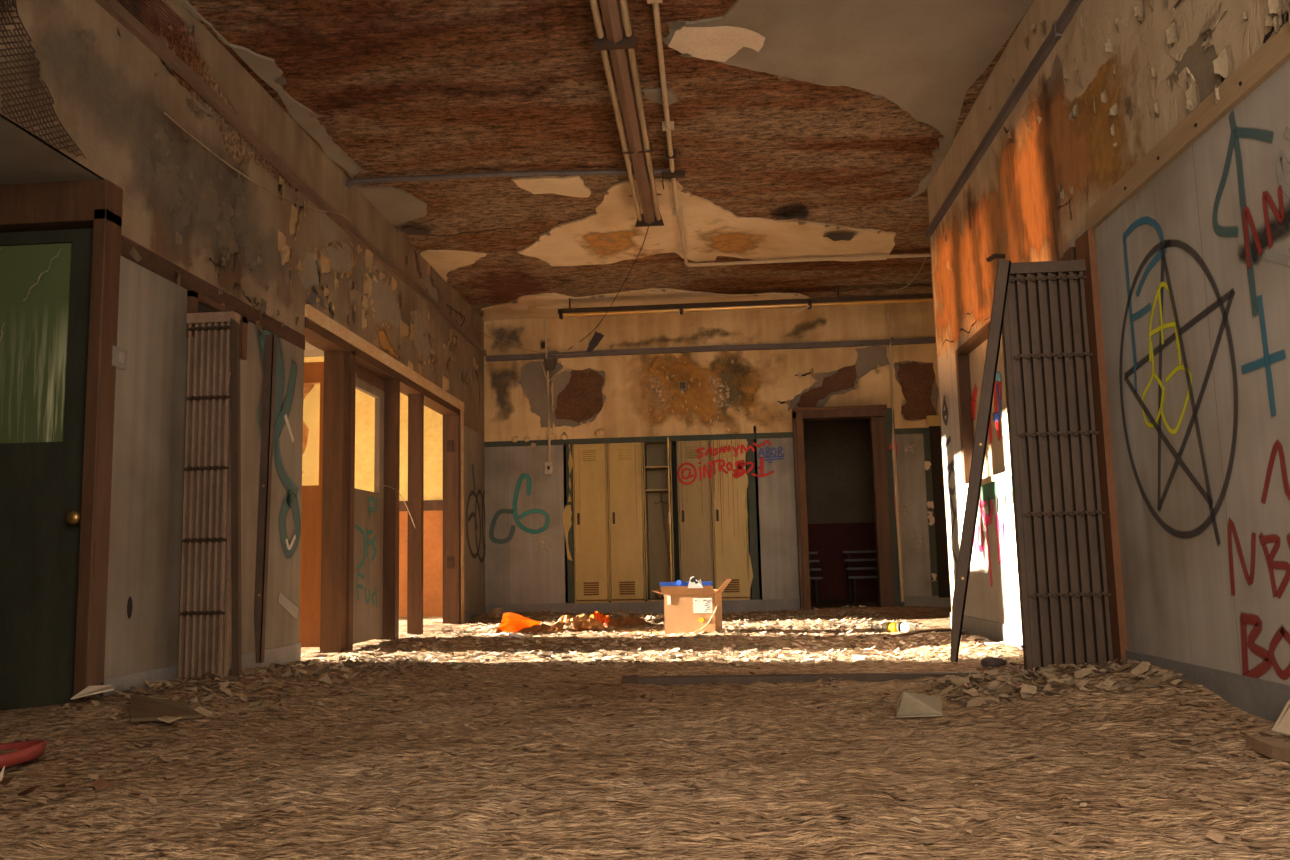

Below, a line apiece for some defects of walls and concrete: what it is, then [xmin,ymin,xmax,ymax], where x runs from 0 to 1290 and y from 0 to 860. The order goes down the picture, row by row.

peeling [45,0,310,192]
peeling [667,21,765,62]
peeling [1093,17,1133,147]
peeling [1149,0,1248,119]
peeling [287,209,413,371]
flaking render [519,361,606,429]
flaking render [788,346,939,421]